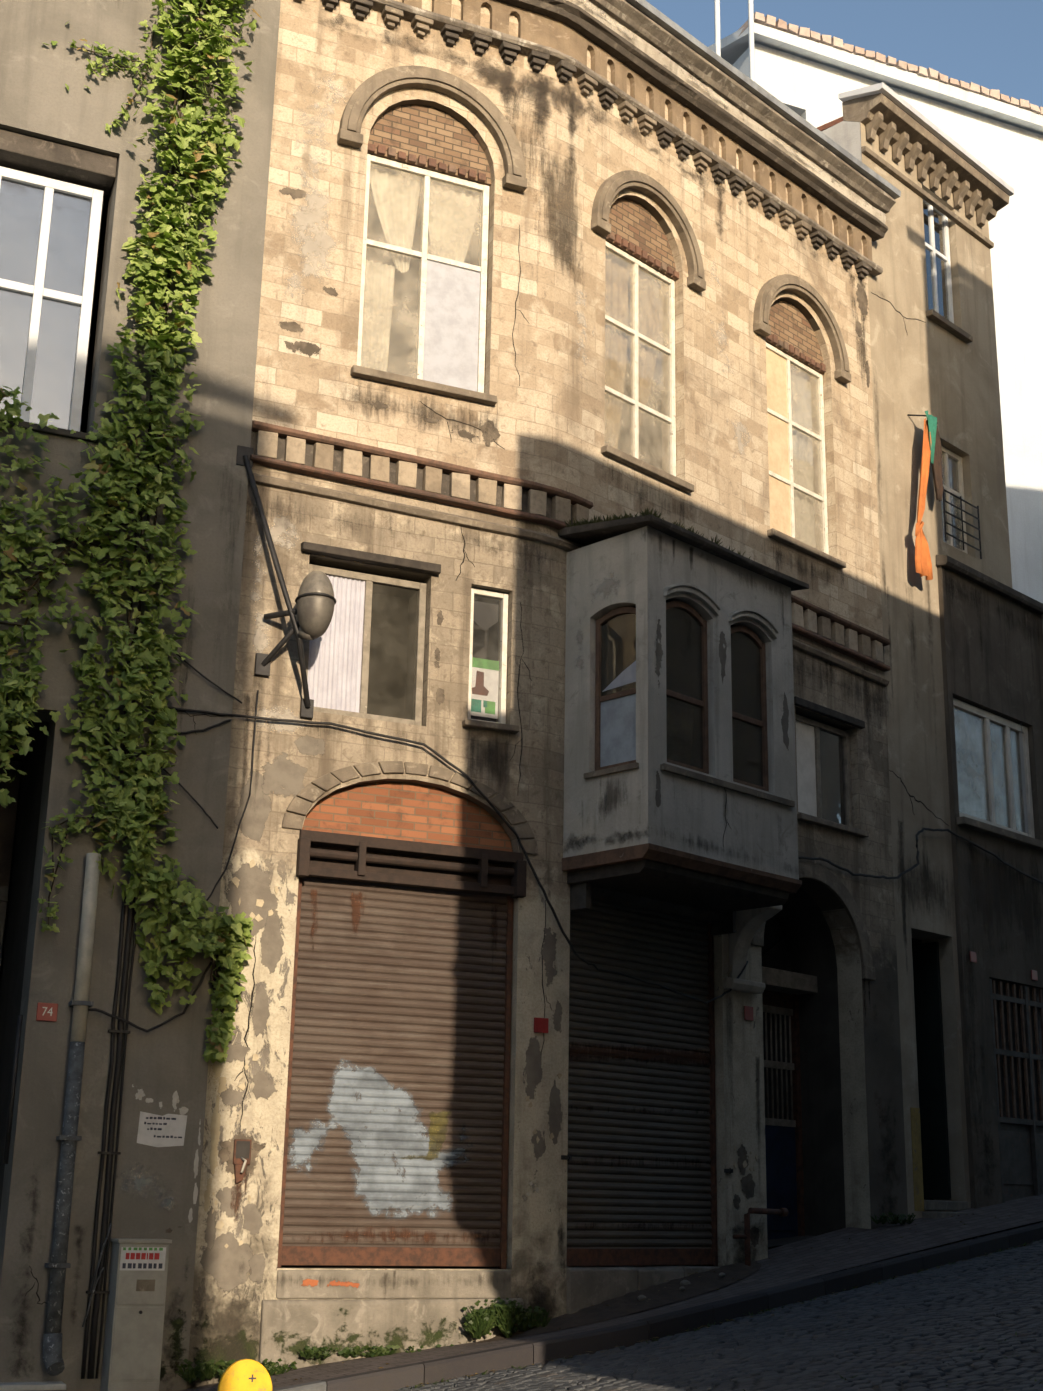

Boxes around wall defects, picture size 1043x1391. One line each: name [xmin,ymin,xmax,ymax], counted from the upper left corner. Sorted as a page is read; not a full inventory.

leakage [535,78,549,124]
spalling [279,187,307,199]
leakage [290,65,532,294]
leakage [544,86,718,293]
spalling [279,321,321,358]
crack [512,224,529,386]
crack [871,292,926,335]
spalling [234,735,325,842]
peeling [541,927,563,1033]
peeling [132,859,284,1292]
peeling [524,1036,563,1161]
spalling [733,1144,758,1208]